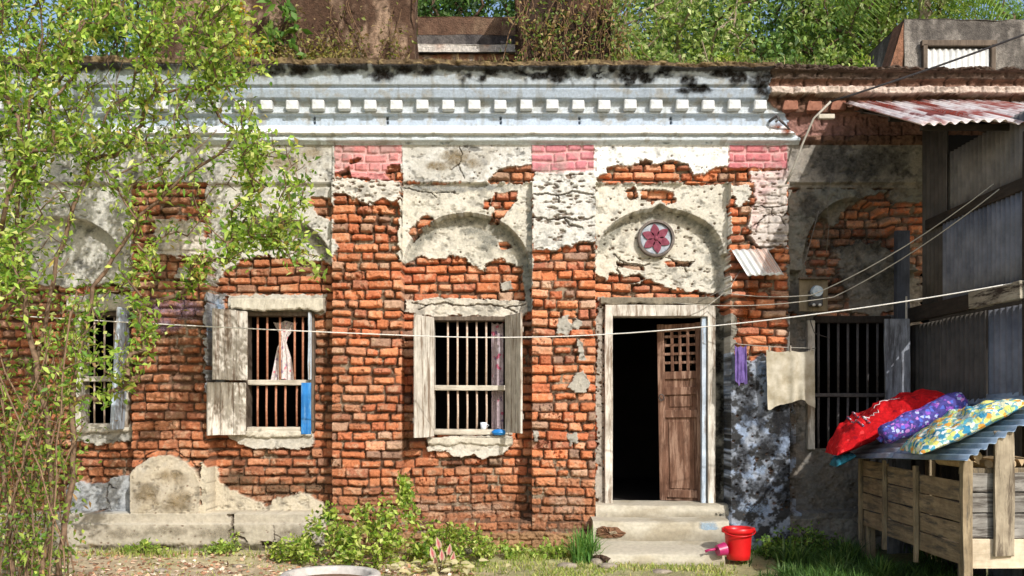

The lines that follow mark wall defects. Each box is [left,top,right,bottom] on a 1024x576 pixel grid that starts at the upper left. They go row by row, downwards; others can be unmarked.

leakage [255,66,311,76]
leakage [371,65,432,81]
leakage [461,69,497,81]
leakage [513,66,669,87]
corrosion [912,101,973,118]
flaking render [805,188,922,316]
flaking render [0,157,797,549]
leakage [716,343,793,504]